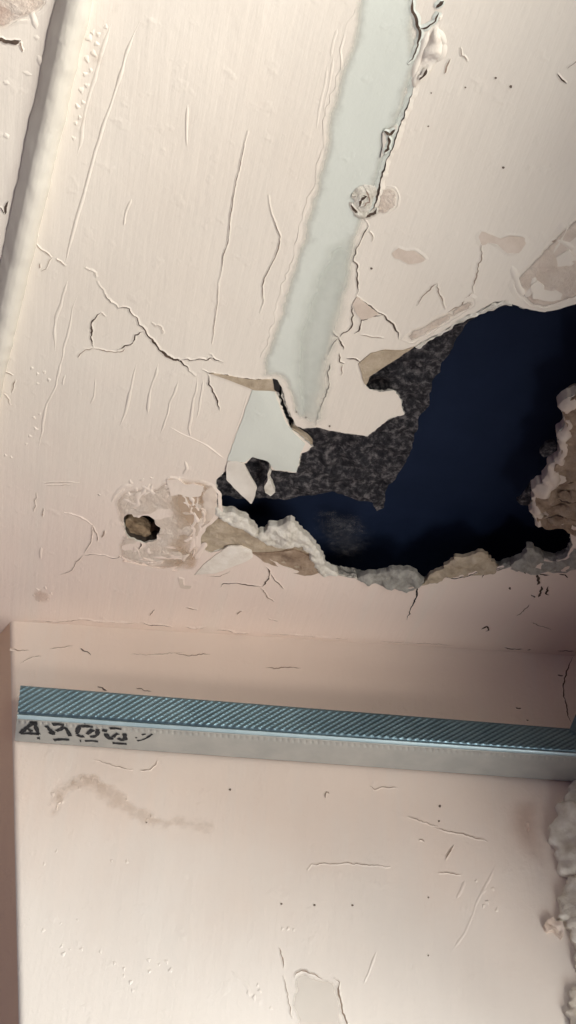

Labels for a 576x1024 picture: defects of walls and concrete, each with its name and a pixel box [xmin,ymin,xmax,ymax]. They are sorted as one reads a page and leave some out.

crack [36,130,282,411]
crack [315,0,469,426]
peeling [359,211,576,421]
crack [206,566,285,602]
spalling [97,382,576,593]
crack [406,588,419,620]
crack [557,656,574,724]